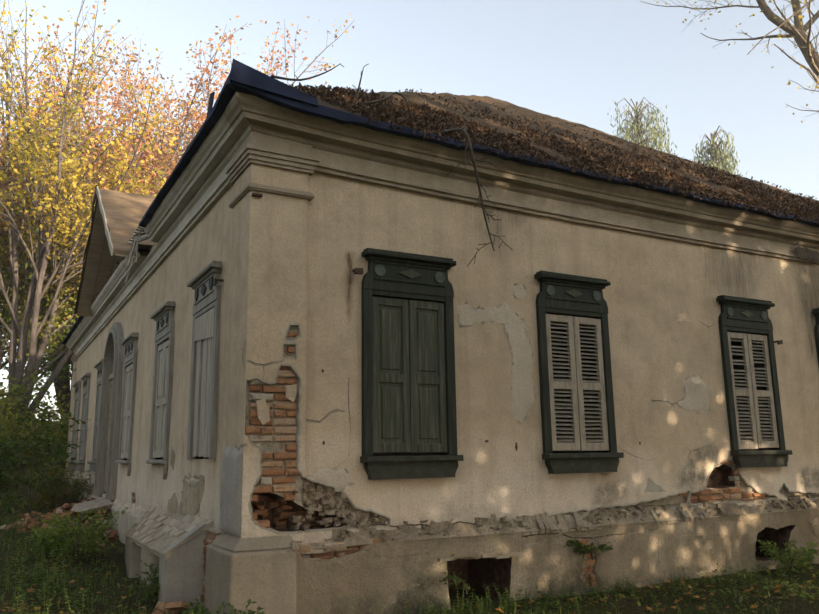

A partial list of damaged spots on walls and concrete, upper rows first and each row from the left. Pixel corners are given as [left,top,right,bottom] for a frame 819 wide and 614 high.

peeling [457,301,536,423]
spalling [241,323,461,562]
spalling [474,514,536,534]
spalling [521,448,819,590]